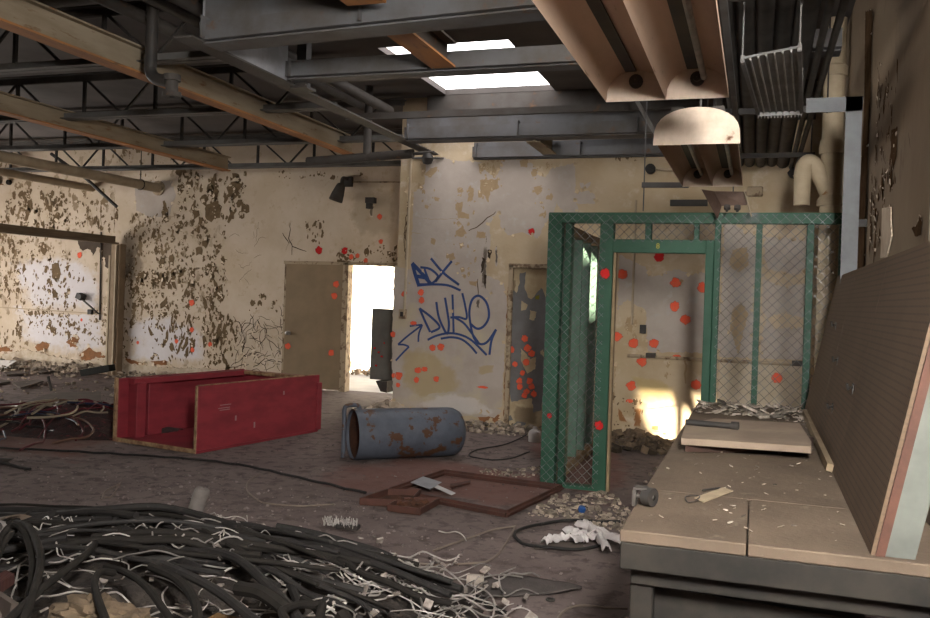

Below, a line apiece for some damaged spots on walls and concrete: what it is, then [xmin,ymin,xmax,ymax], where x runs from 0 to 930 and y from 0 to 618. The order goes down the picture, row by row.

spalling [857,9,898,269]
spalling [0,188,118,370]
spalling [122,170,249,375]
peeling [249,294,278,312]
peeling [336,155,579,426]